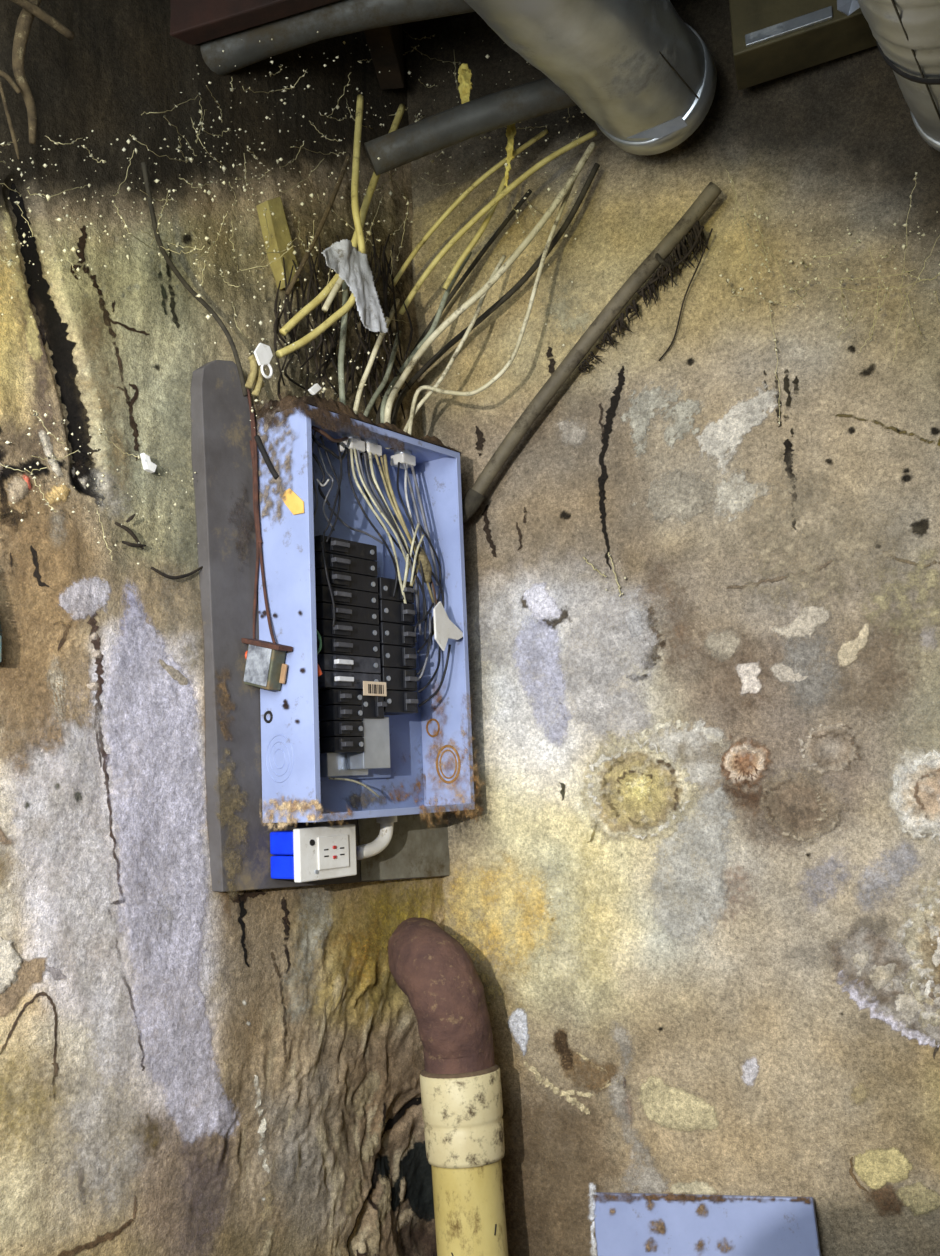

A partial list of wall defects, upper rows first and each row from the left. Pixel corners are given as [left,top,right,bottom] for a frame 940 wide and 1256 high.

crack [2,183,150,503]
crack [836,414,940,446]
crack [598,366,625,570]
peeling [59,577,110,620]
rust [720,736,771,802]
peeling [0,590,238,1207]
damp [852,949,940,1024]
damp [932,937,940,967]
crack [0,992,59,1101]
spalling [362,1120,386,1162]
crack [58,1195,137,1256]
spalling [366,1177,413,1256]